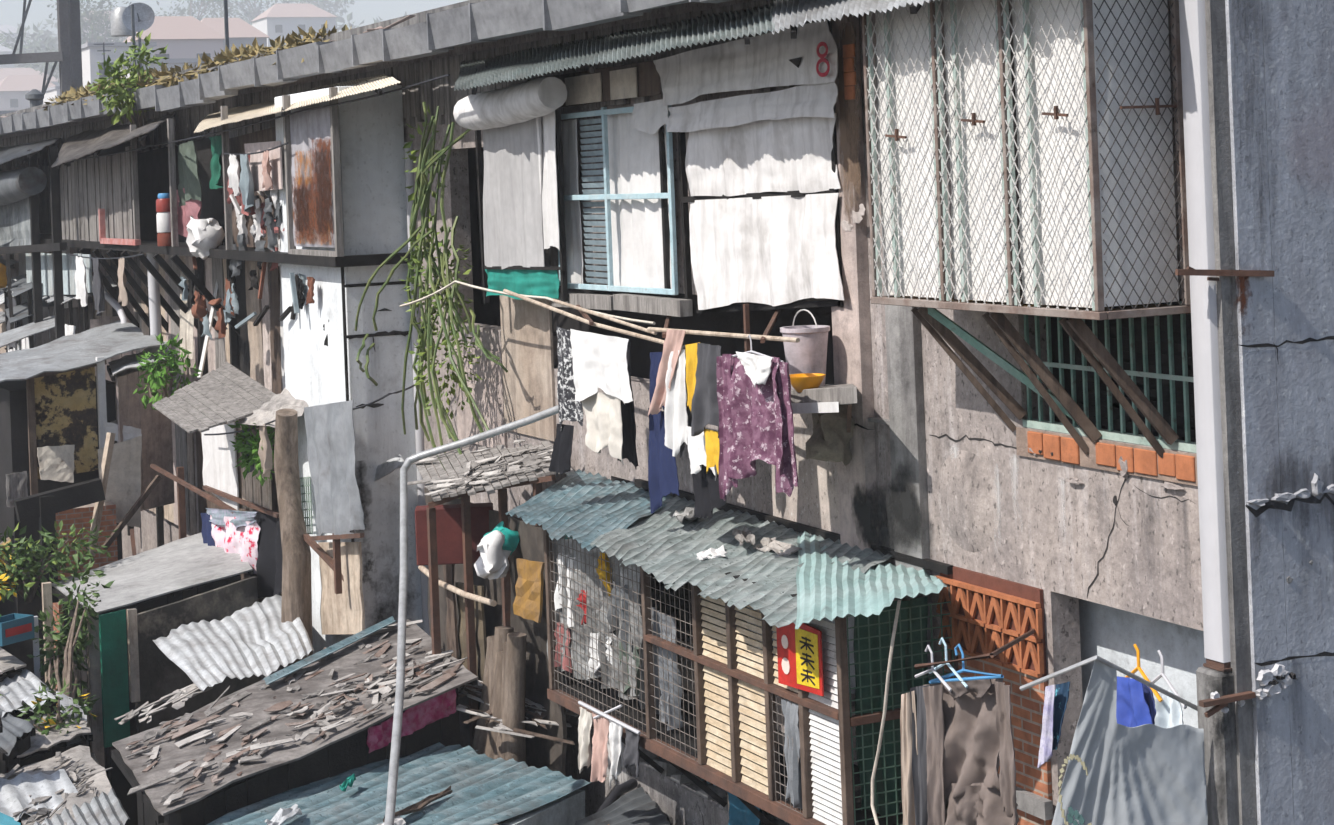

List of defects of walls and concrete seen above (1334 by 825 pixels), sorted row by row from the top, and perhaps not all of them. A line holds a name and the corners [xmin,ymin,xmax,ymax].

rust [290,107,335,248]
rust [1236,276,1250,315]
crack [1236,336,1334,364]
crack [931,434,1017,449]
leakage [853,465,921,552]
crack [1087,479,1194,596]
spalling [1255,663,1297,700]